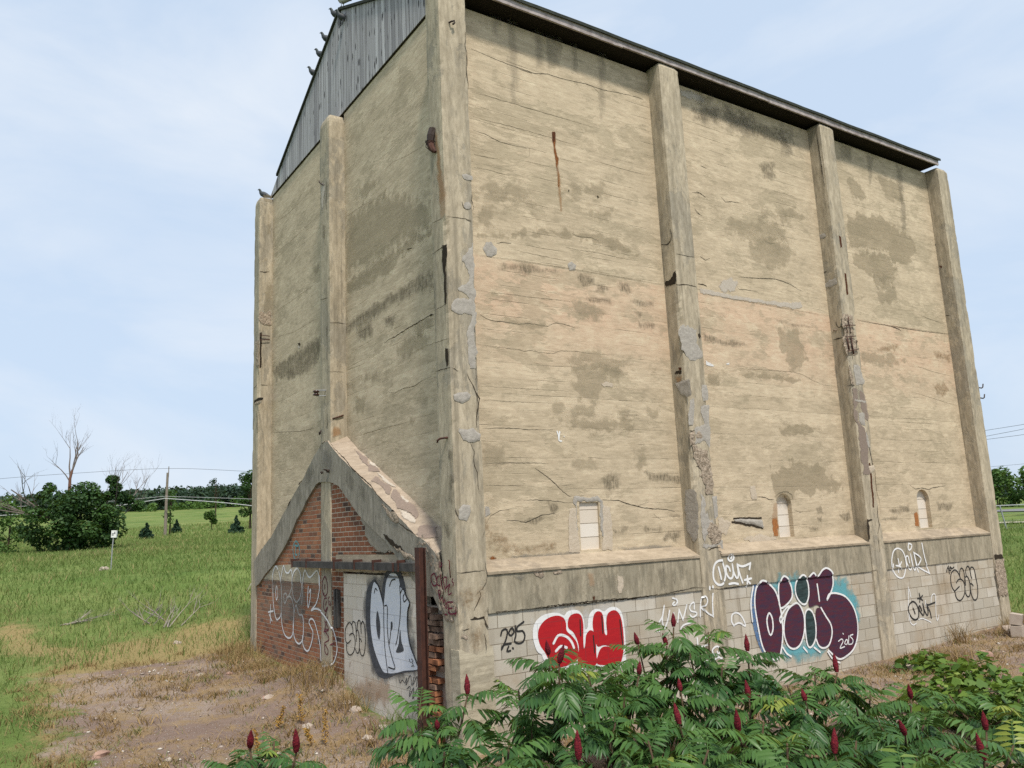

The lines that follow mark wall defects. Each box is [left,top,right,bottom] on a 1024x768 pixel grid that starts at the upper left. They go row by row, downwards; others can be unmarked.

rust [552,132,561,202]
spalling [833,314,858,356]
peeling [853,388,875,475]
peeling [368,460,416,523]
spalling [688,398,722,550]